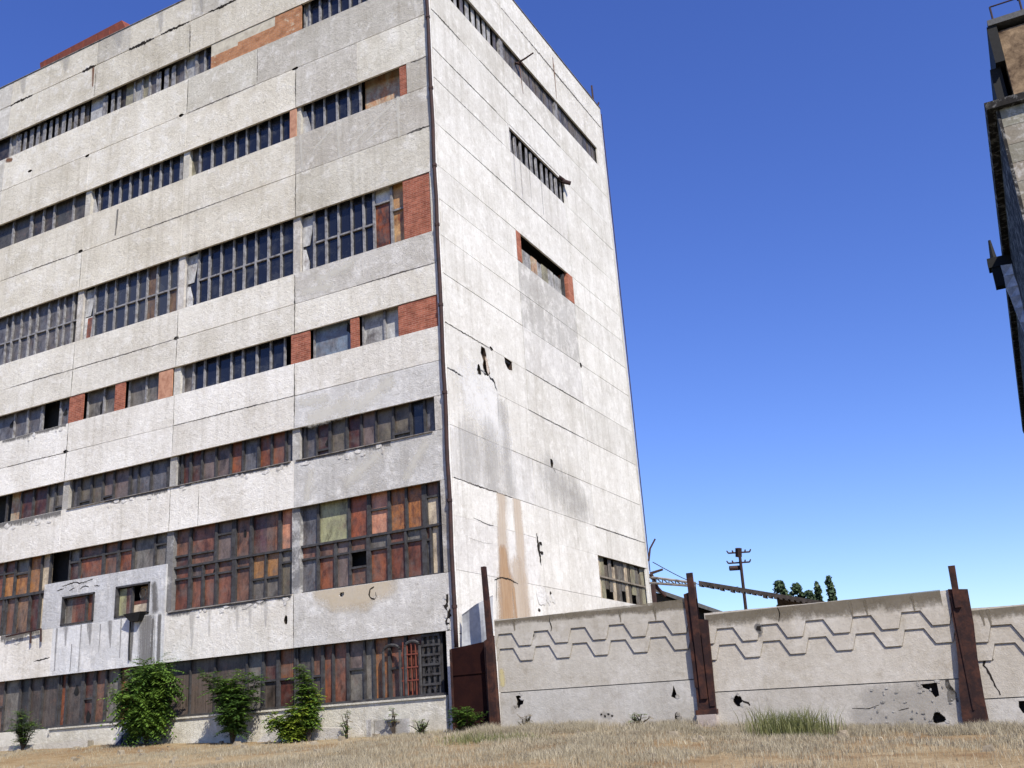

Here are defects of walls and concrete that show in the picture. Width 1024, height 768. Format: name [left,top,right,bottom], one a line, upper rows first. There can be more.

spalling [477,346,496,388]
rust [497,493,530,619]
damp [54,582,161,670]
crack [982,658,1001,695]
hole [731,692,750,707]
spalling [852,680,952,724]